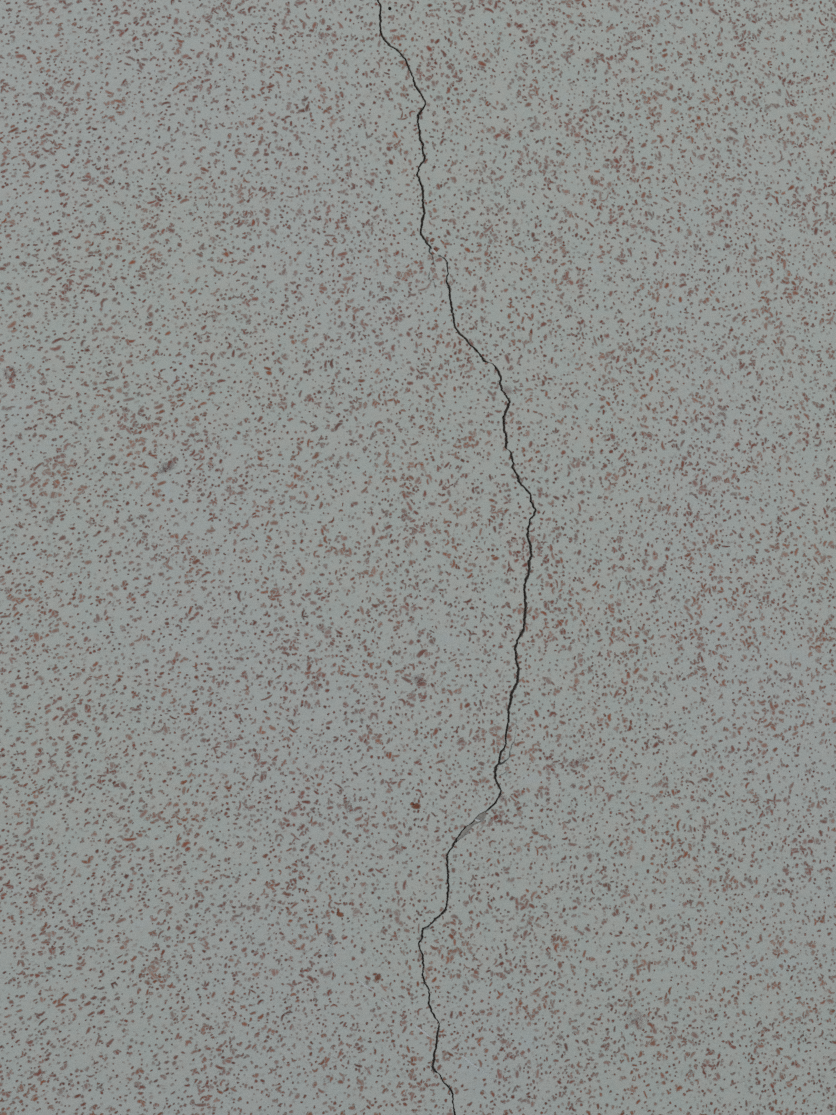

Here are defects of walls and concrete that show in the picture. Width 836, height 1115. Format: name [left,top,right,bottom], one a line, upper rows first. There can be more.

crack [377,0,537,1115]